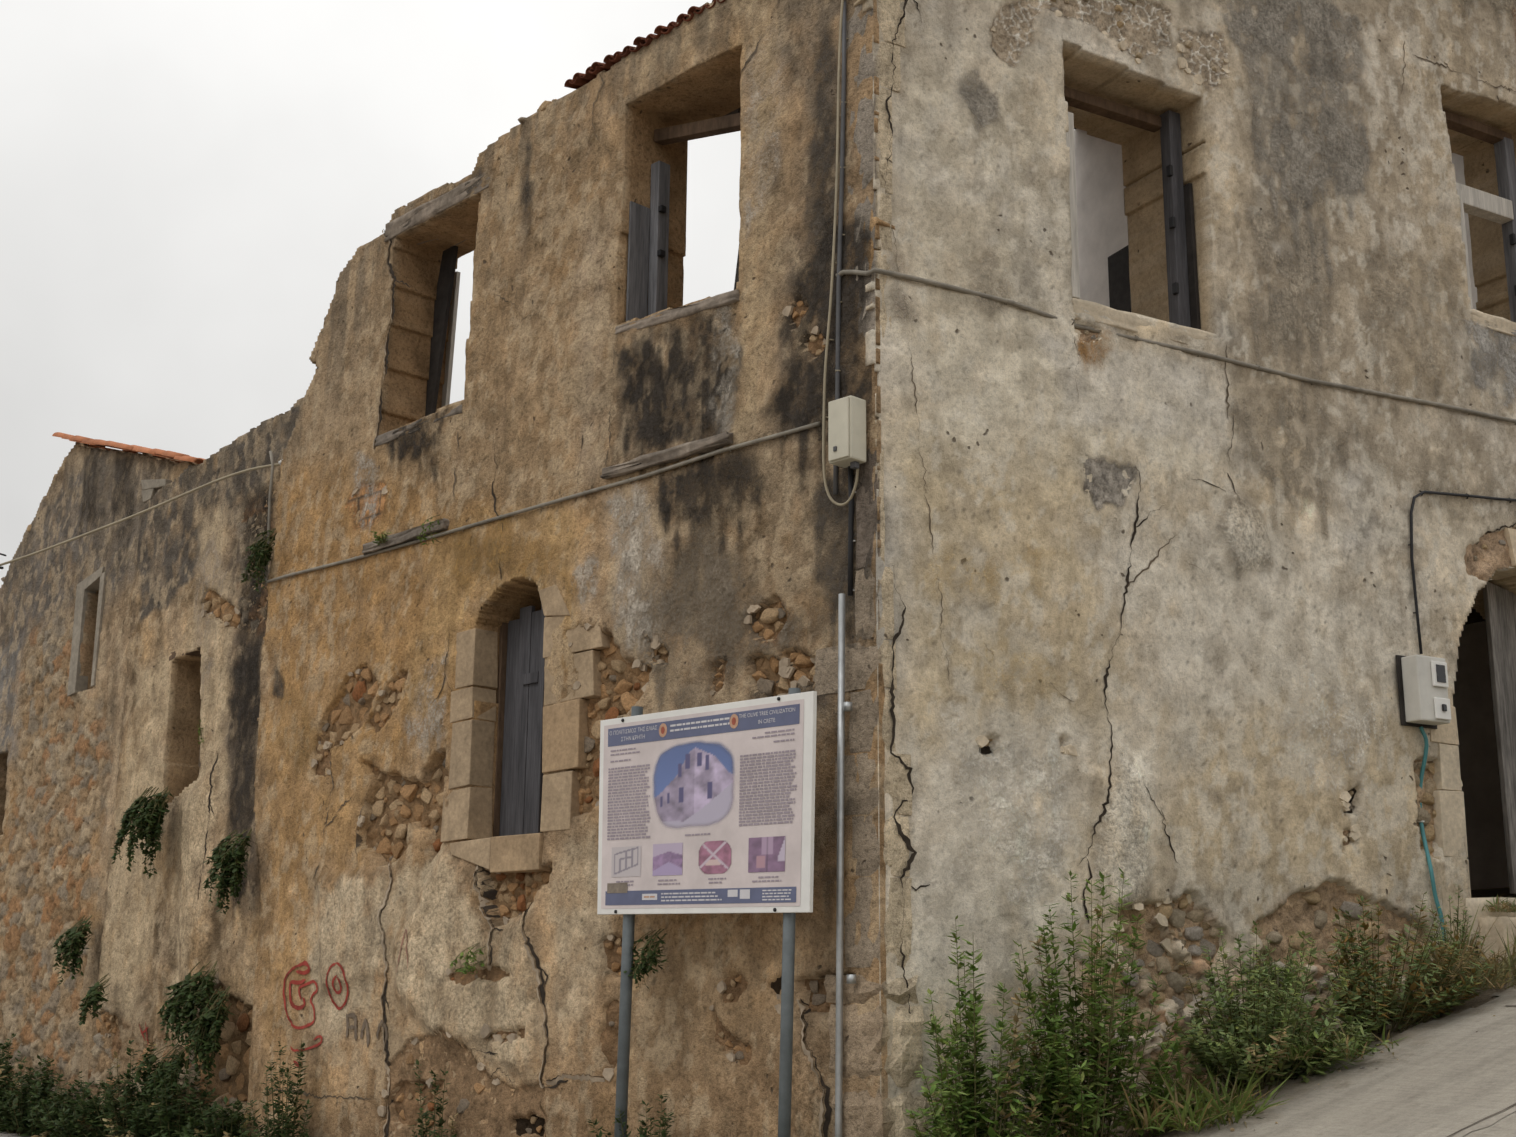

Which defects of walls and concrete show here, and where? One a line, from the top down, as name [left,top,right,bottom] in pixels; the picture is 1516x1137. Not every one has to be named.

spalling [990,0,1231,90]
crack [878,0,952,1014]
damp [228,487,283,917]
crack [273,749,394,1137]
spalling [357,754,449,865]
spalling [490,868,552,925]
crack [458,865,605,1088]
spalling [573,632,669,815]
crack [797,998,832,1137]
damp [809,690,849,745]
crack [1050,345,1252,923]
spalling [1100,893,1220,1039]